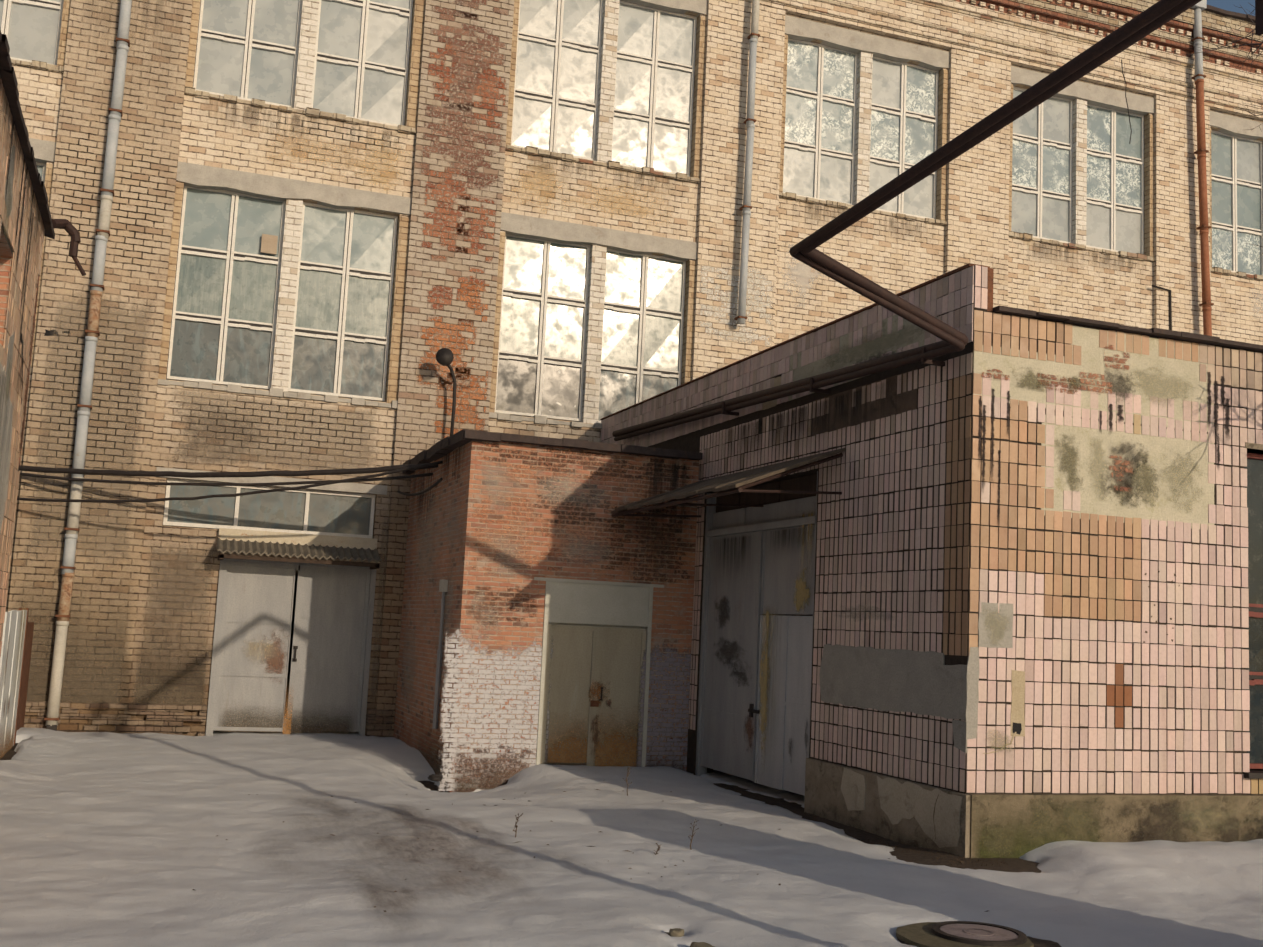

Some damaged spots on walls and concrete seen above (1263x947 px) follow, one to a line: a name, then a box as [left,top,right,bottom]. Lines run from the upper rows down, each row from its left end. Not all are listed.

spalling [418,0,506,438]
spalling [492,443,688,525]
leakage [978,389,1011,521]
leakage [1207,372,1230,466]
corrosion [254,634,284,674]
corrosion [222,706,351,734]
peeling [419,587,553,792]
corrosion [544,682,638,767]
flaking render [841,768,963,848]
leakage [1131,804,1190,842]
leakage [1216,818,1263,842]